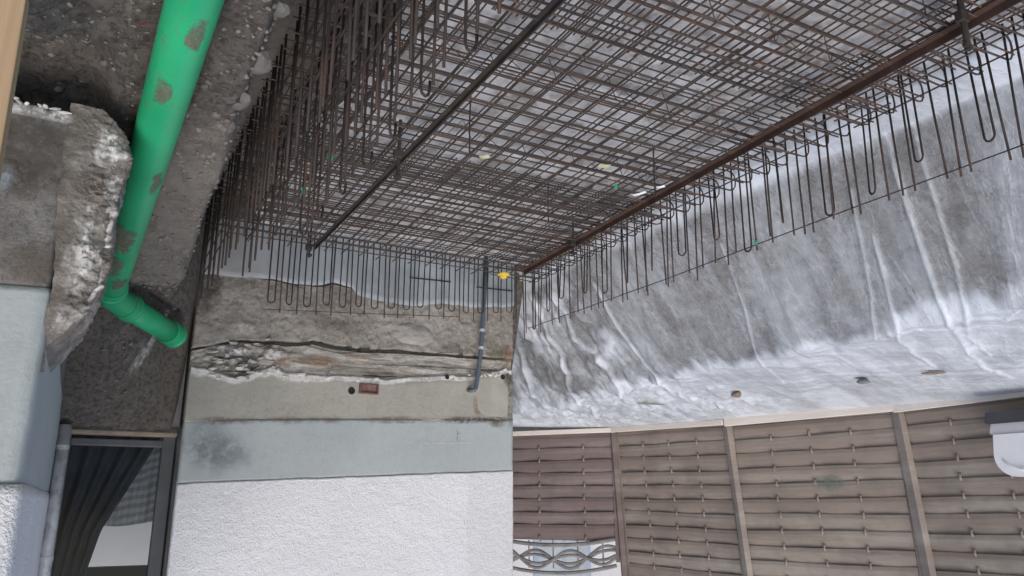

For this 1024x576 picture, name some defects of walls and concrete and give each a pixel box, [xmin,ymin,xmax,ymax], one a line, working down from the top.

spalling [190,337,512,394]
crack [219,341,509,378]